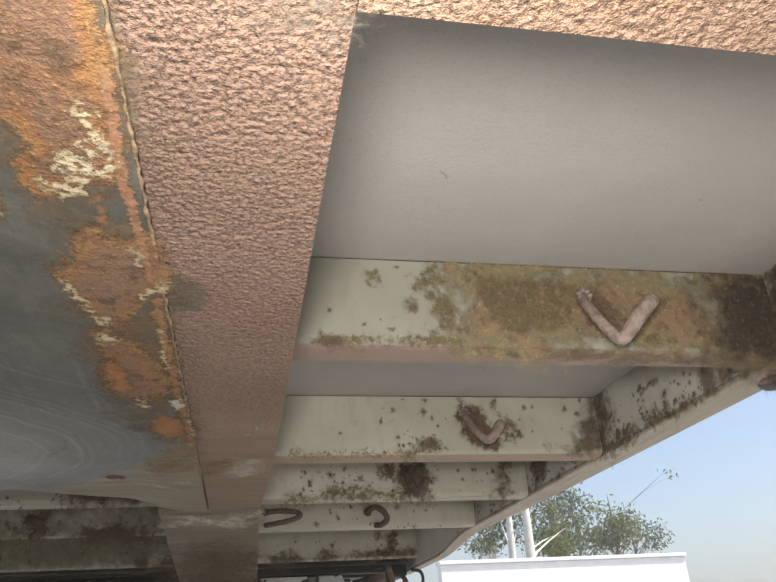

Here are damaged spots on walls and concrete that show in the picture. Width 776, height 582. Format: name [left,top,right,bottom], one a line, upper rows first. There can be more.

rust [0,0,200,444]
damp [421,261,776,385]
rust [396,462,434,502]
rust [454,399,521,451]